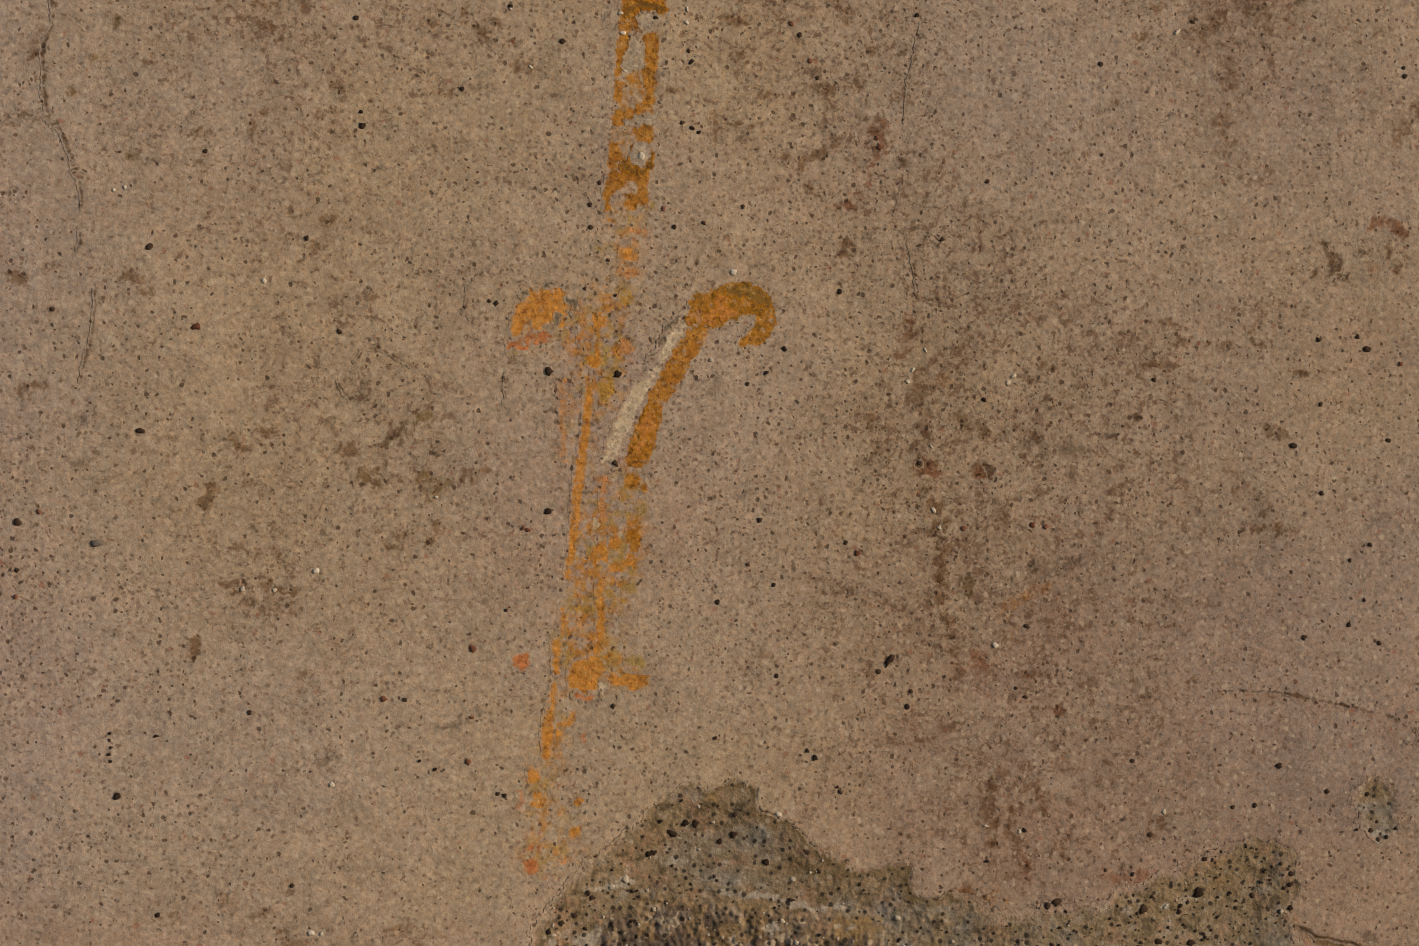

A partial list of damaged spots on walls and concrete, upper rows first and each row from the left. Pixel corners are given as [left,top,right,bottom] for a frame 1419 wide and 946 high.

spalling [527,777,1300,946]
crack [1290,913,1402,946]